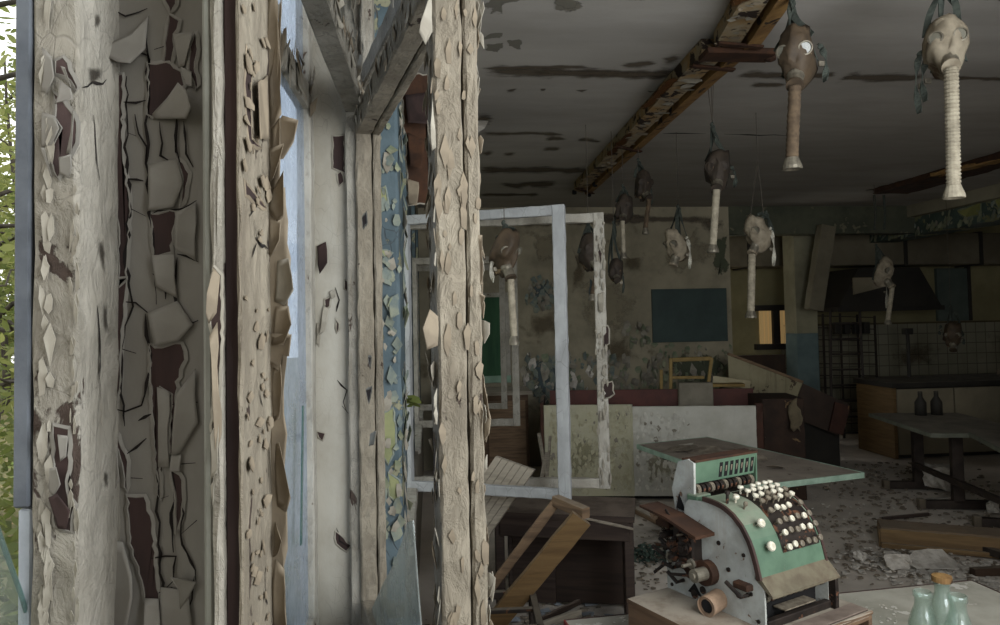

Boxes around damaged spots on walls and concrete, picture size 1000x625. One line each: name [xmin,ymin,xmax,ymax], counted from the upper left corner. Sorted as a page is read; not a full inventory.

peeling [36,47,82,625]
crack [83,38,198,454]
peeling [109,0,201,403]
crack [134,455,197,605]
peeling [114,153,225,625]
peeling [243,0,318,625]
peeling [317,242,327,274]
peeling [331,134,345,187]
peeling [369,0,522,569]
leakage [533,316,555,333]
leakage [555,0,582,12]
leakage [486,56,678,79]